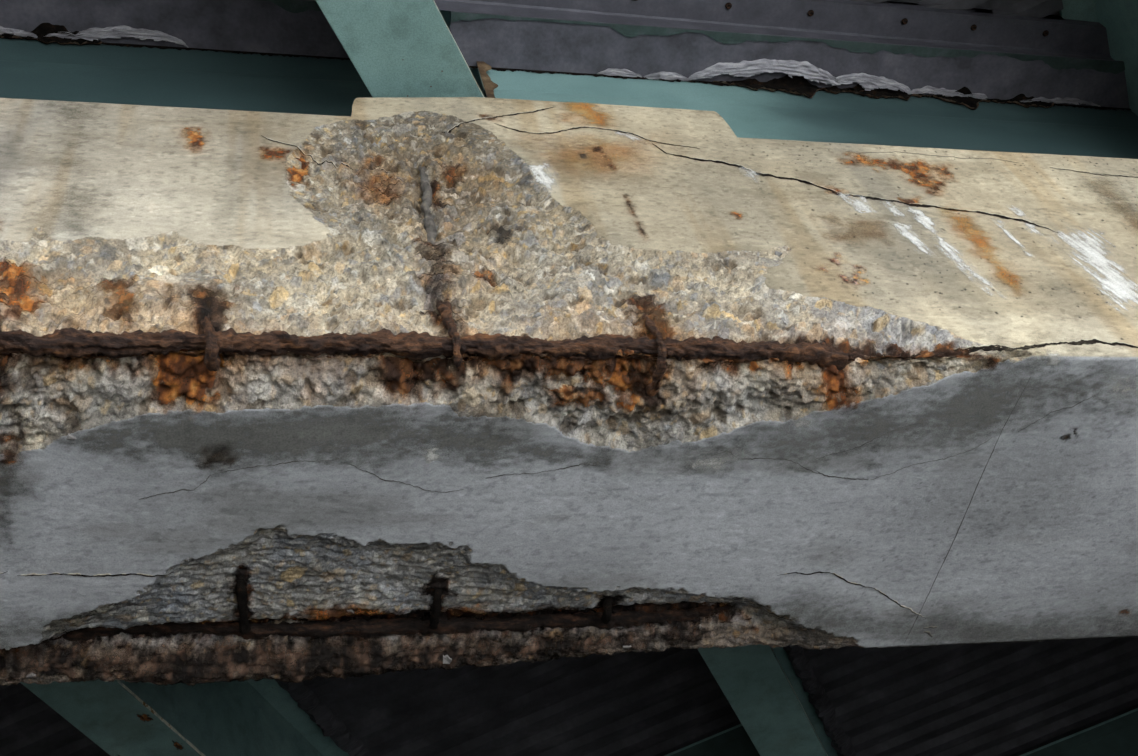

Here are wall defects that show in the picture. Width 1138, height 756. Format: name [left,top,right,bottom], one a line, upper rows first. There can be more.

crack [442,107,1059,233]
corrosion [841,154,954,205]
spalling [0,111,1032,454]
leakage [834,194,989,289]
leakage [1058,231,1138,309]
corrosion [326,293,675,412]
corrosion [795,332,1001,410]
crack [954,339,1138,353]
crack [0,570,173,578]
corrosion [0,601,759,686]
spalling [0,525,878,686]
crack [780,571,937,637]